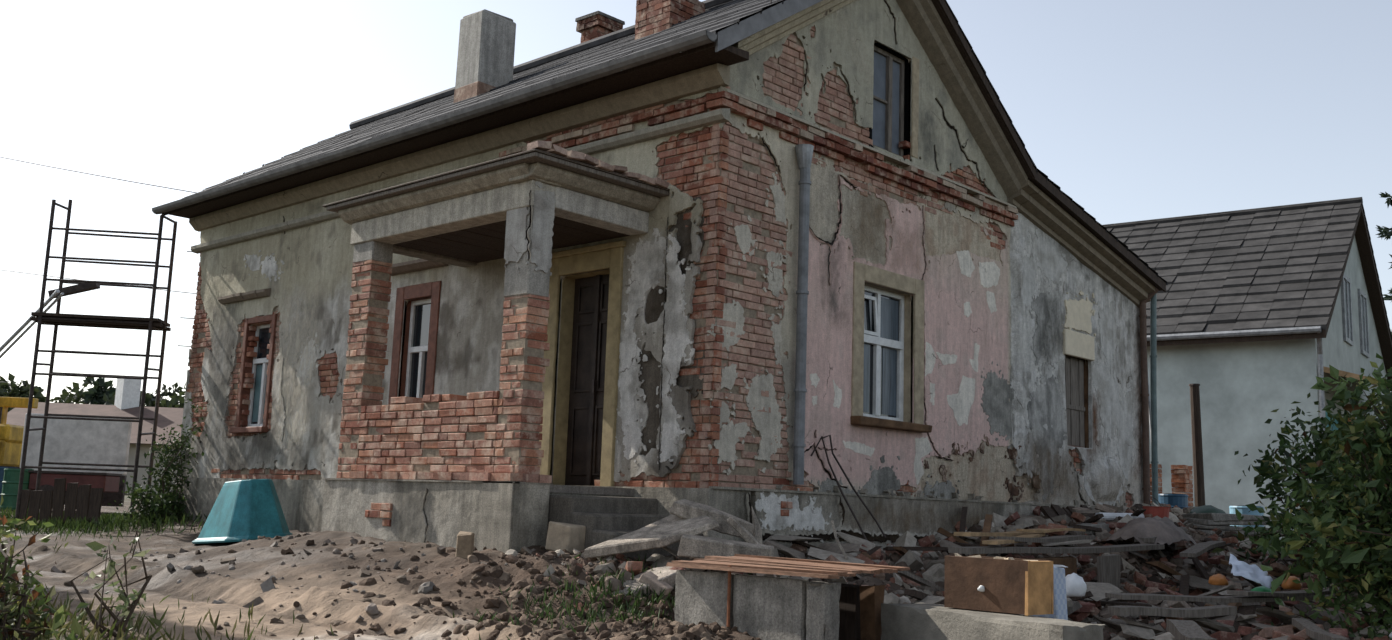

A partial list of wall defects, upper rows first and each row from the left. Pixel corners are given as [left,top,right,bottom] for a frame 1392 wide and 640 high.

flaking render [762,26,873,147]
crack [934,97,993,194]
flaking render [941,166,994,197]
peeling [956,222,1006,317]
peeling [1023,228,1068,312]
flaking render [594,122,956,574]
crack [922,205,954,461]
flaking render [896,342,1068,559]
peeling [1066,358,1191,622]